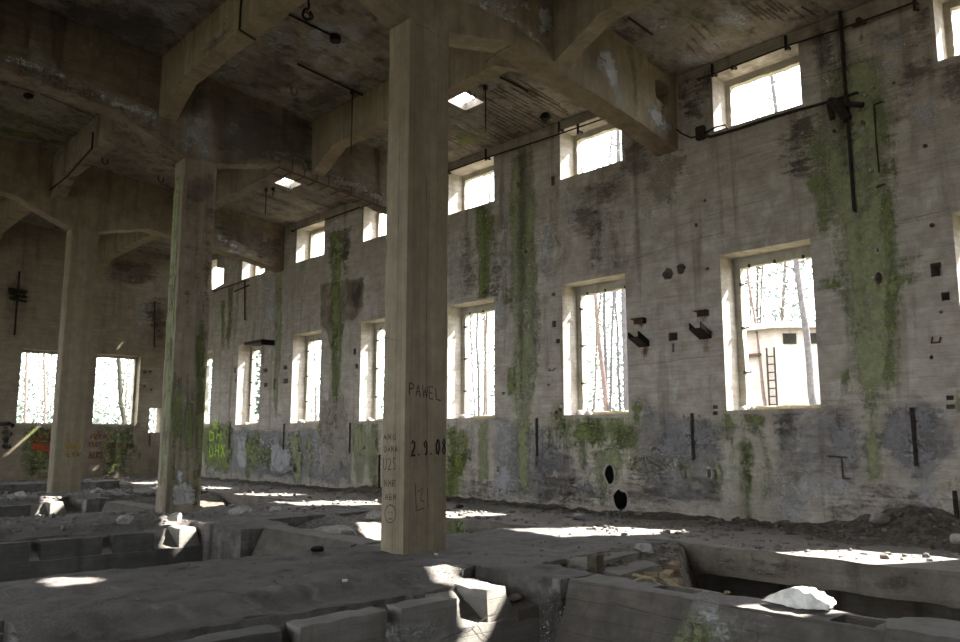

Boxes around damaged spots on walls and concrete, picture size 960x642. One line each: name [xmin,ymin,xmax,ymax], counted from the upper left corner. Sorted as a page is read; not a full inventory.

leakage [145,179,215,506]
leakage [321,278,364,427]
leakage [272,439,290,472]
leakage [829,403,929,513]